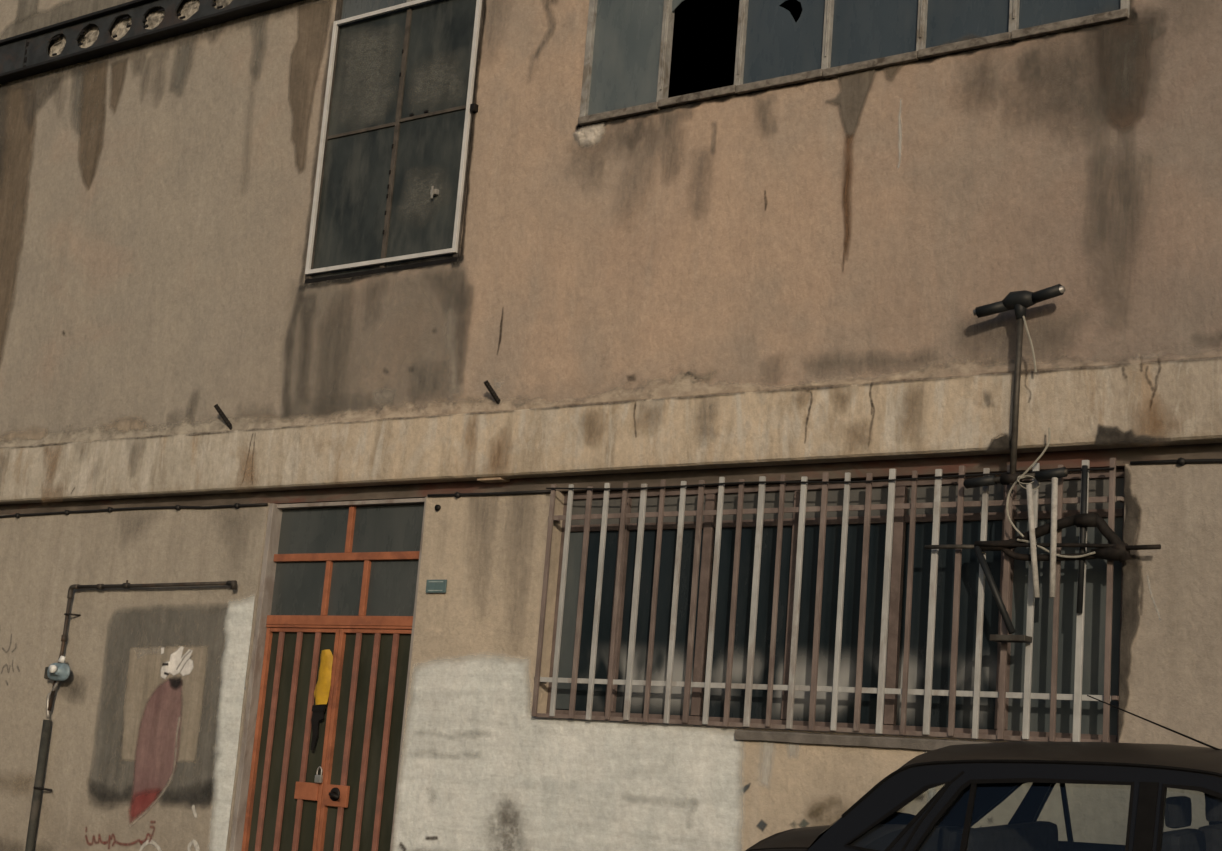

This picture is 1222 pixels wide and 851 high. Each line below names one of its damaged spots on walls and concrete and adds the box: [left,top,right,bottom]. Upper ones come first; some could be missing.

damp [73,60,149,188]
damp [289,1,331,171]
damp [0,81,58,361]
corrosion [843,136,852,264]
crack [551,399,646,434]
crack [768,377,952,430]
crack [989,357,1194,408]